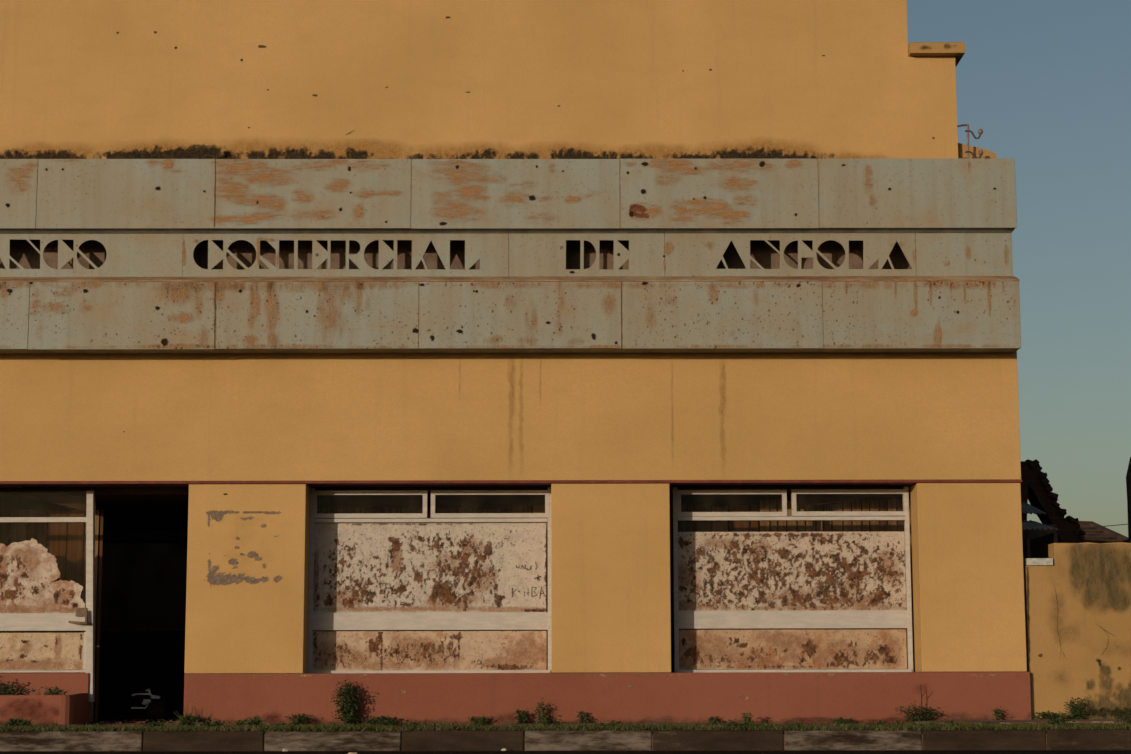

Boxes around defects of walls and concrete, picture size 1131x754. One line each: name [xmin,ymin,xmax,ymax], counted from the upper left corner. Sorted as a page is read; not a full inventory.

water stain [0,143,861,159]
peeling [206,511,281,537]
peeling [0,555,78,608]
peeling [207,537,282,585]
peeling [315,523,512,611]
peeling [678,532,906,611]
water stain [1071,544,1131,610]
peeling [313,632,462,675]
peeling [472,660,532,670]
peeling [682,637,818,675]
peeling [826,640,897,676]